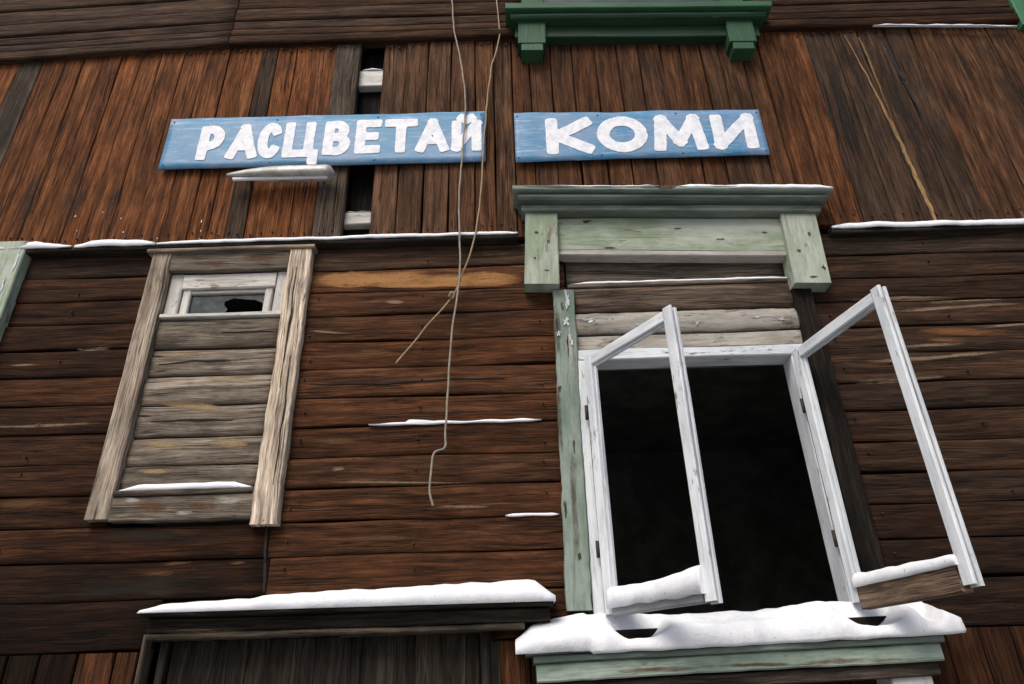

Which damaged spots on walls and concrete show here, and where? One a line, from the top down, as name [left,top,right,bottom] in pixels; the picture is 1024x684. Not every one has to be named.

crack [844,35,970,220]
peeling [554,289,573,363]